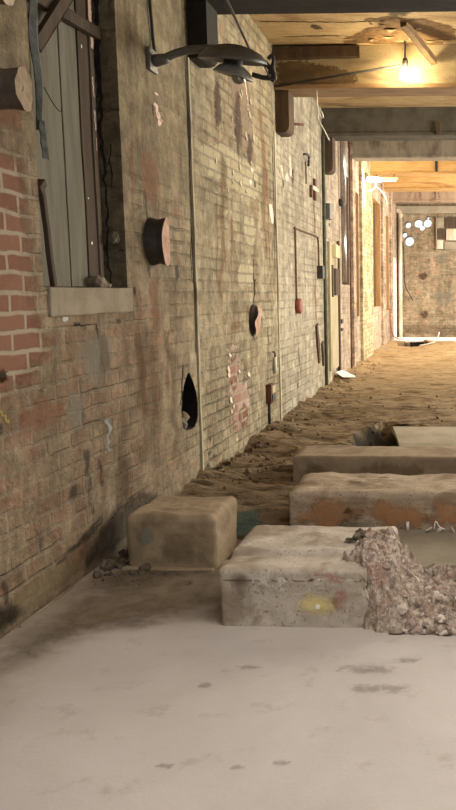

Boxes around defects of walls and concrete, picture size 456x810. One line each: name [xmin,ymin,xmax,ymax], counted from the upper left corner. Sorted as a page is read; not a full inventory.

crack [93,0,125,284]
peeling [226,343,250,448]
damp [57,493,157,567]